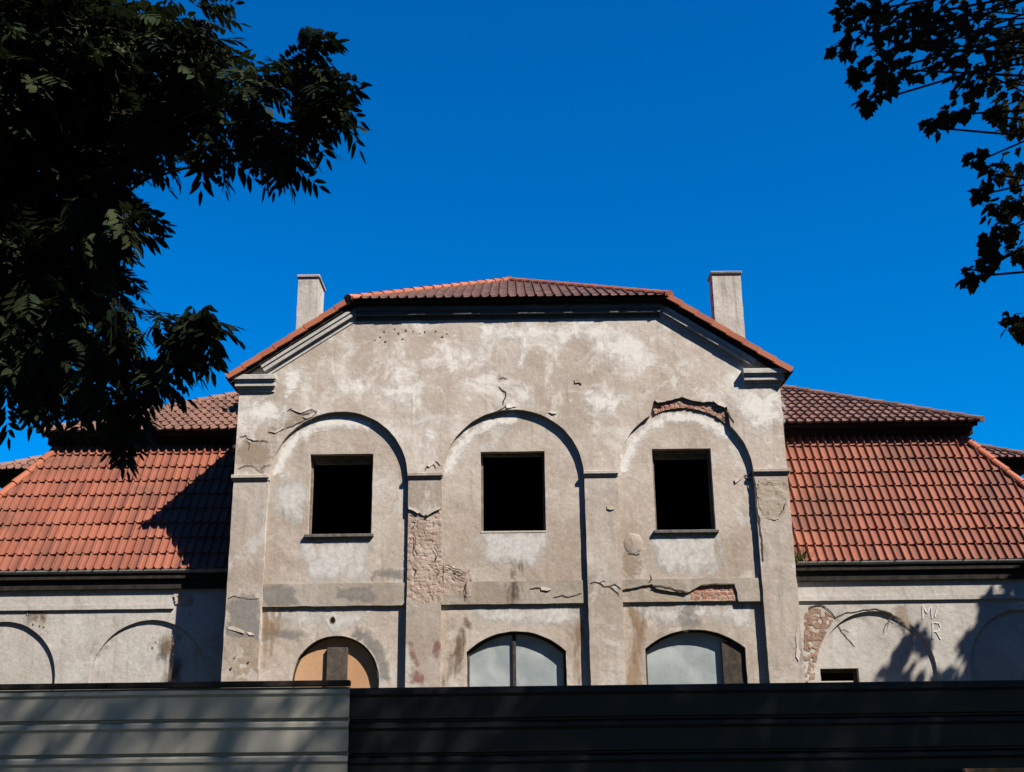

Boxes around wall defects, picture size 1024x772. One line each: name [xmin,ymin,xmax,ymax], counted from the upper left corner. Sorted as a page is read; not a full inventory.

crack [497,377,516,411]
spalling [653,398,728,424]
spalling [407,507,472,604]
damp [454,621,470,670]
spalling [795,604,837,683]
crack [834,608,899,645]